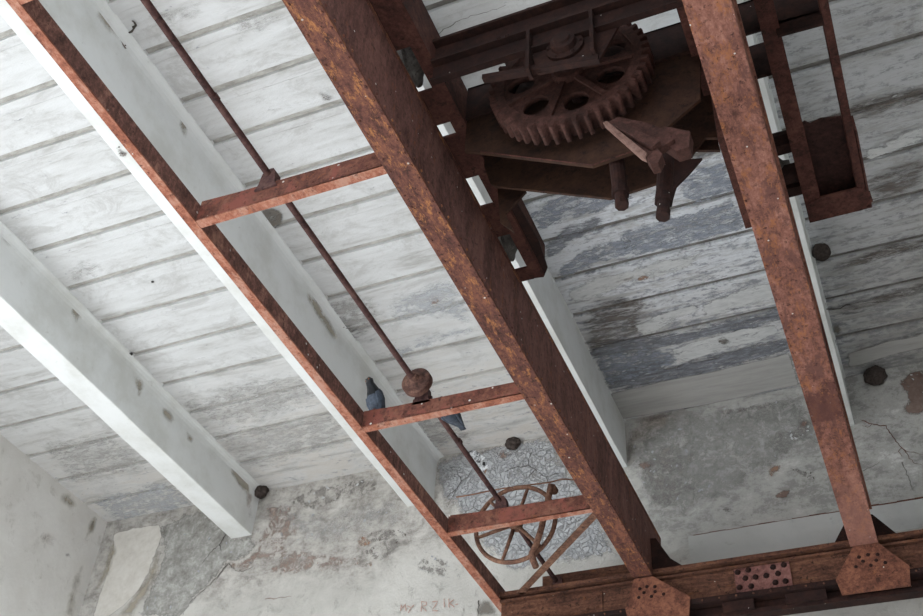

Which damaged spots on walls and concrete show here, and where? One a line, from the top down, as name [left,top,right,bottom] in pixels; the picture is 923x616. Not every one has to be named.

peeling [869,163,923,200]
peeling [530,196,615,257]
peeling [559,164,743,279]
peeling [842,241,923,270]
peeling [585,283,798,419]
peeling [848,334,923,366]
peeling [901,370,923,414]
crack [862,420,923,506]
crack [189,534,252,603]
flaking render [94,479,375,616]
crack [693,511,839,536]